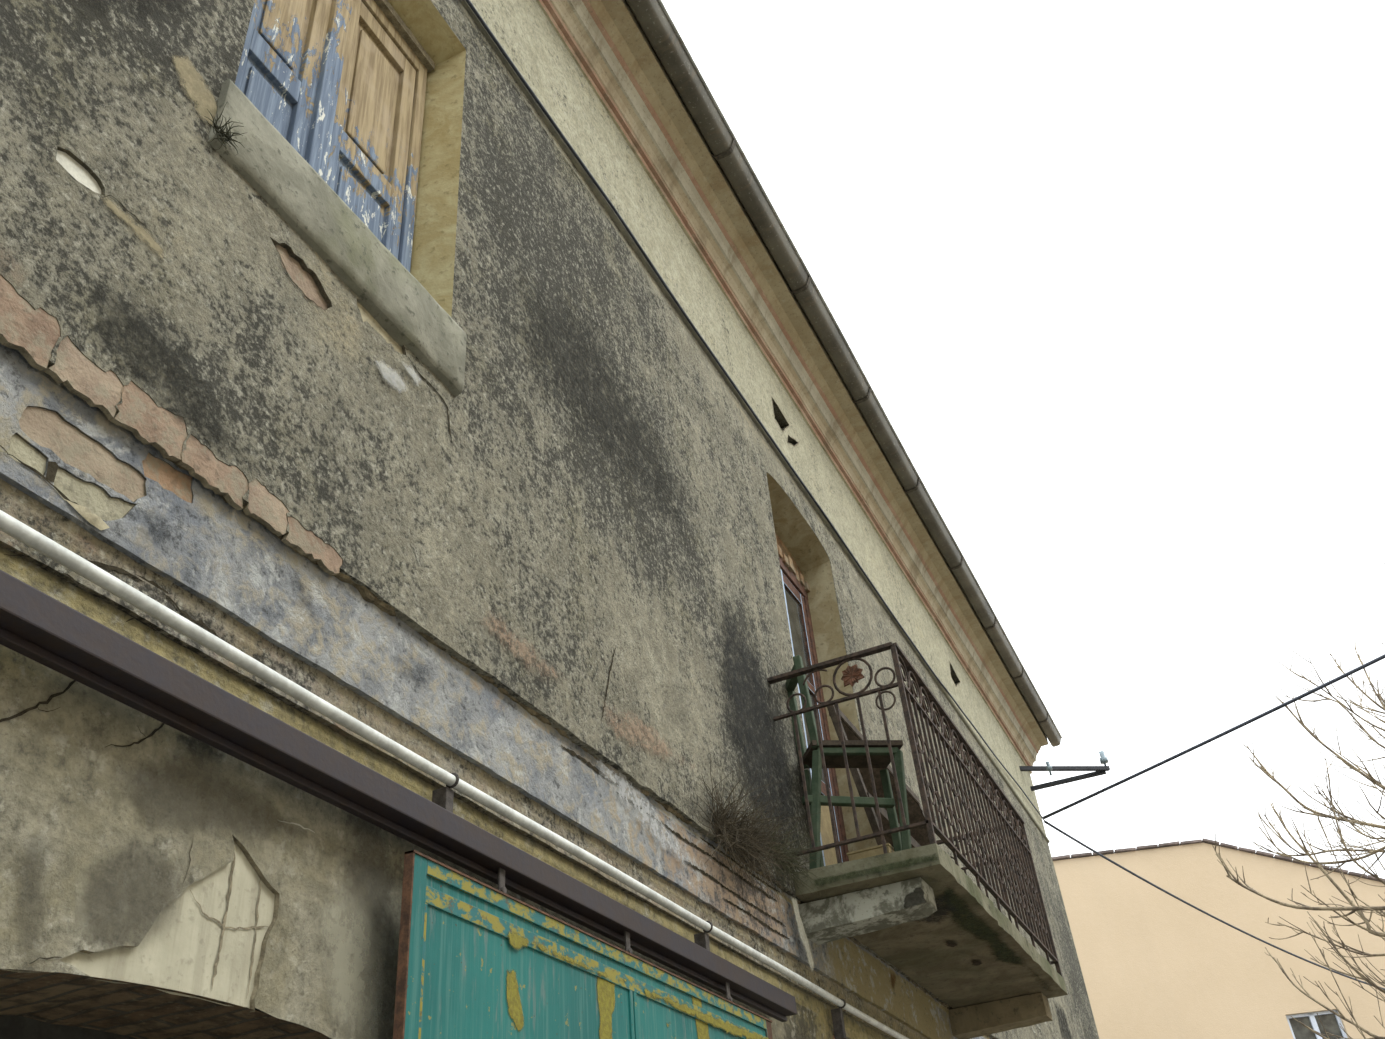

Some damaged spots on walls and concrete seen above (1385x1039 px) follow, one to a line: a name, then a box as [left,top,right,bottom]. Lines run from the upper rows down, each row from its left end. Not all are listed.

spalling [56,147,163,258]
spalling [270,237,332,310]
flaking render [0,275,343,575]
crack [0,680,76,722]
leakage [724,604,791,851]
peeling [507,932,627,1039]
peeling [645,989,769,1039]